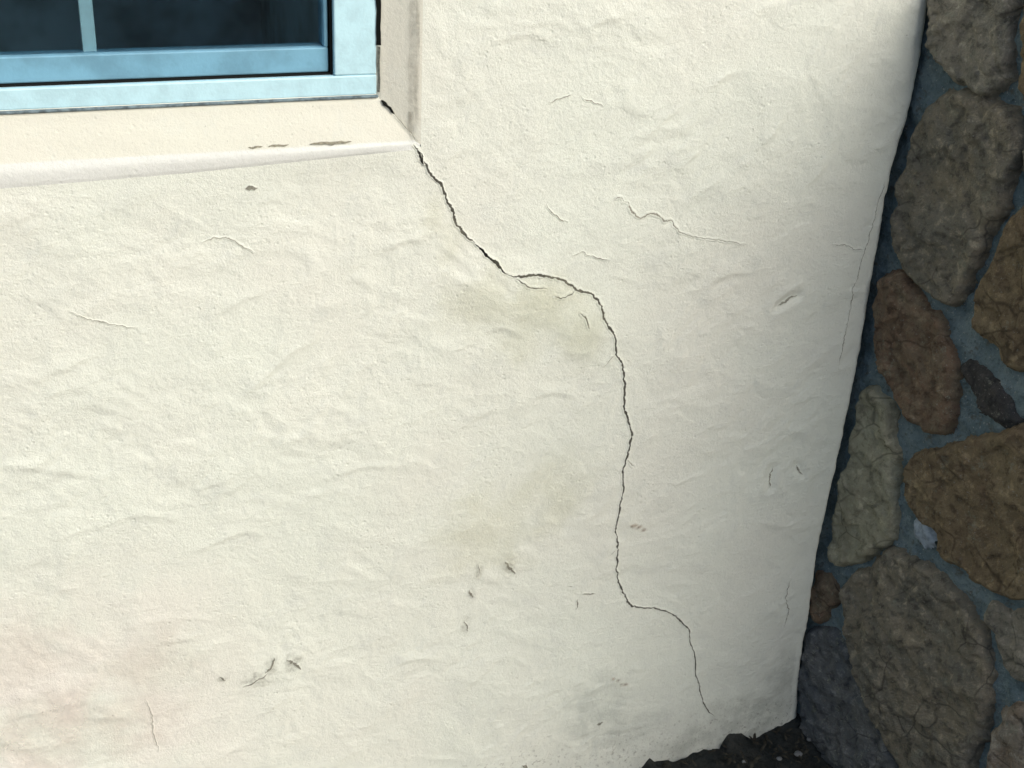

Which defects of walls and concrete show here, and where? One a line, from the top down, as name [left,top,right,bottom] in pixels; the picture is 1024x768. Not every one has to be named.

crack [381,100,715,717]
crack [615,194,746,247]